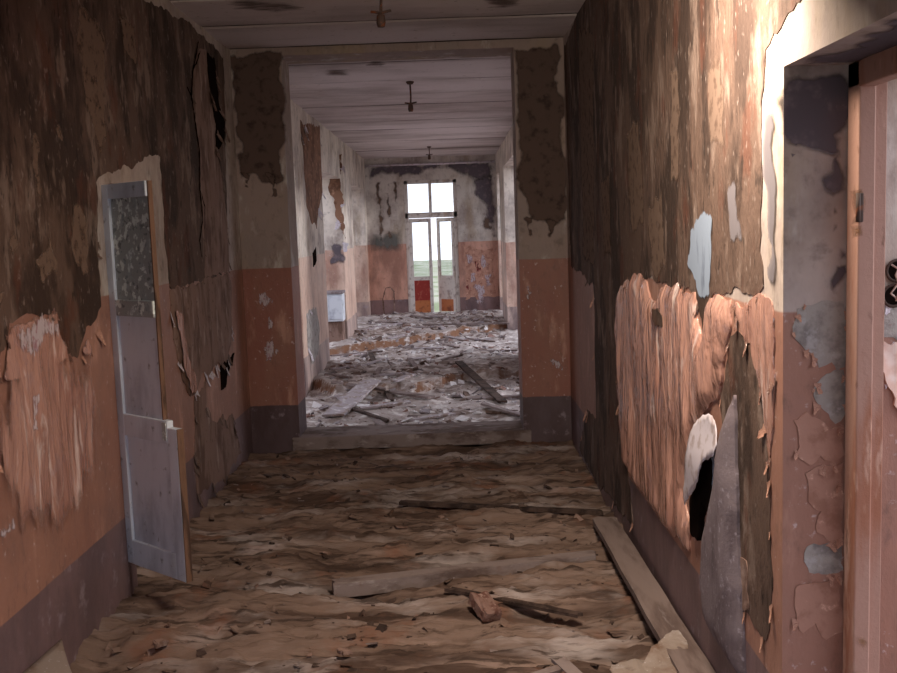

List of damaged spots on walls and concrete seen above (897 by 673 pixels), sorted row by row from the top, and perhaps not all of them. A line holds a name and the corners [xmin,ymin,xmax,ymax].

peeling [0,0,241,508]
peeling [300,120,349,252]
peeling [564,0,801,532]
flaking render [792,300,846,473]
peeling [883,305,897,409]
peeling [683,331,773,653]
peeling [792,538,844,640]